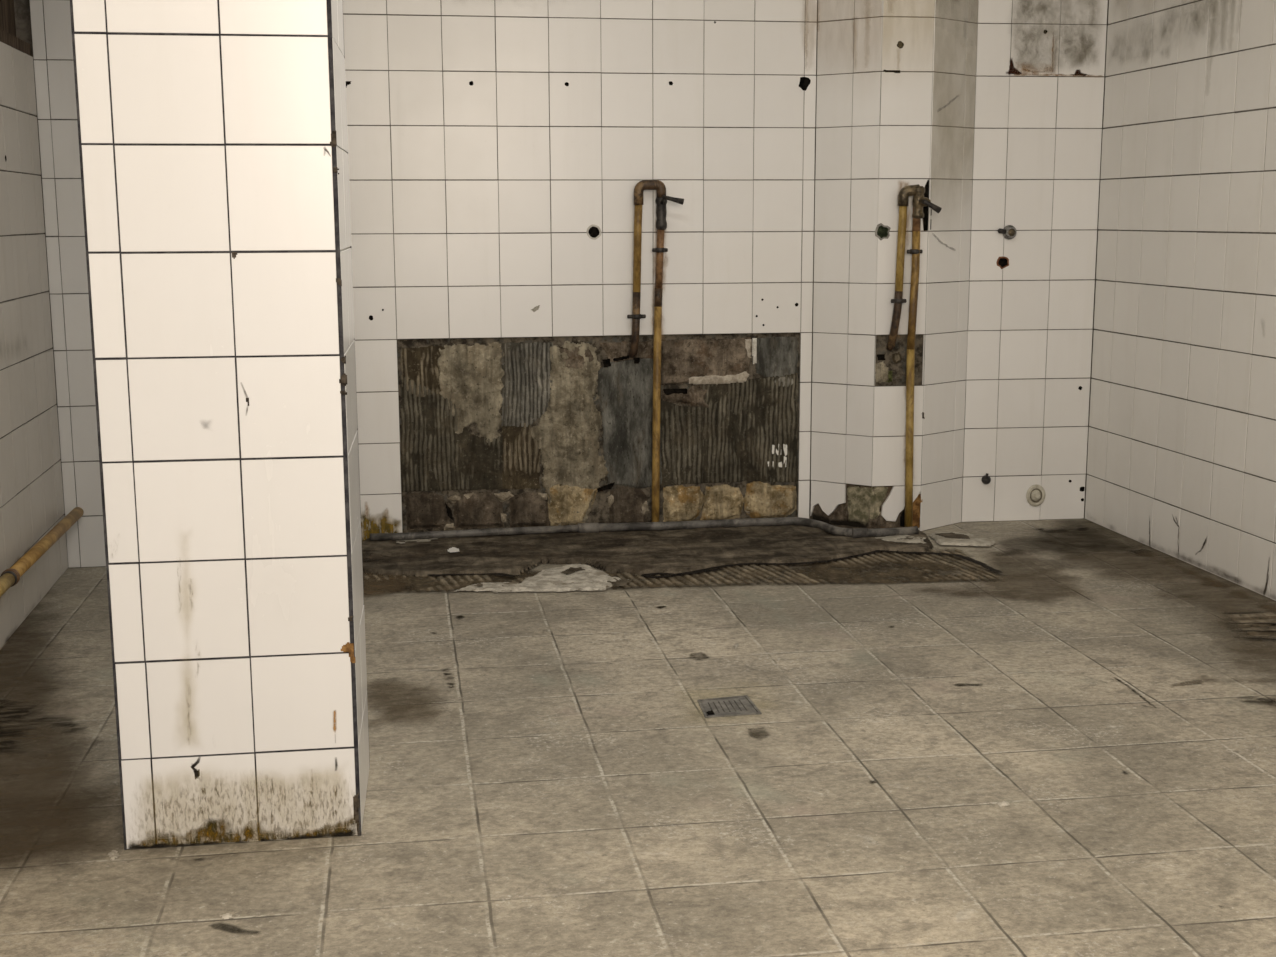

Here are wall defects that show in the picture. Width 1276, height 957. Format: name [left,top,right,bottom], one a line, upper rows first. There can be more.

peeling [397,333,923,533]